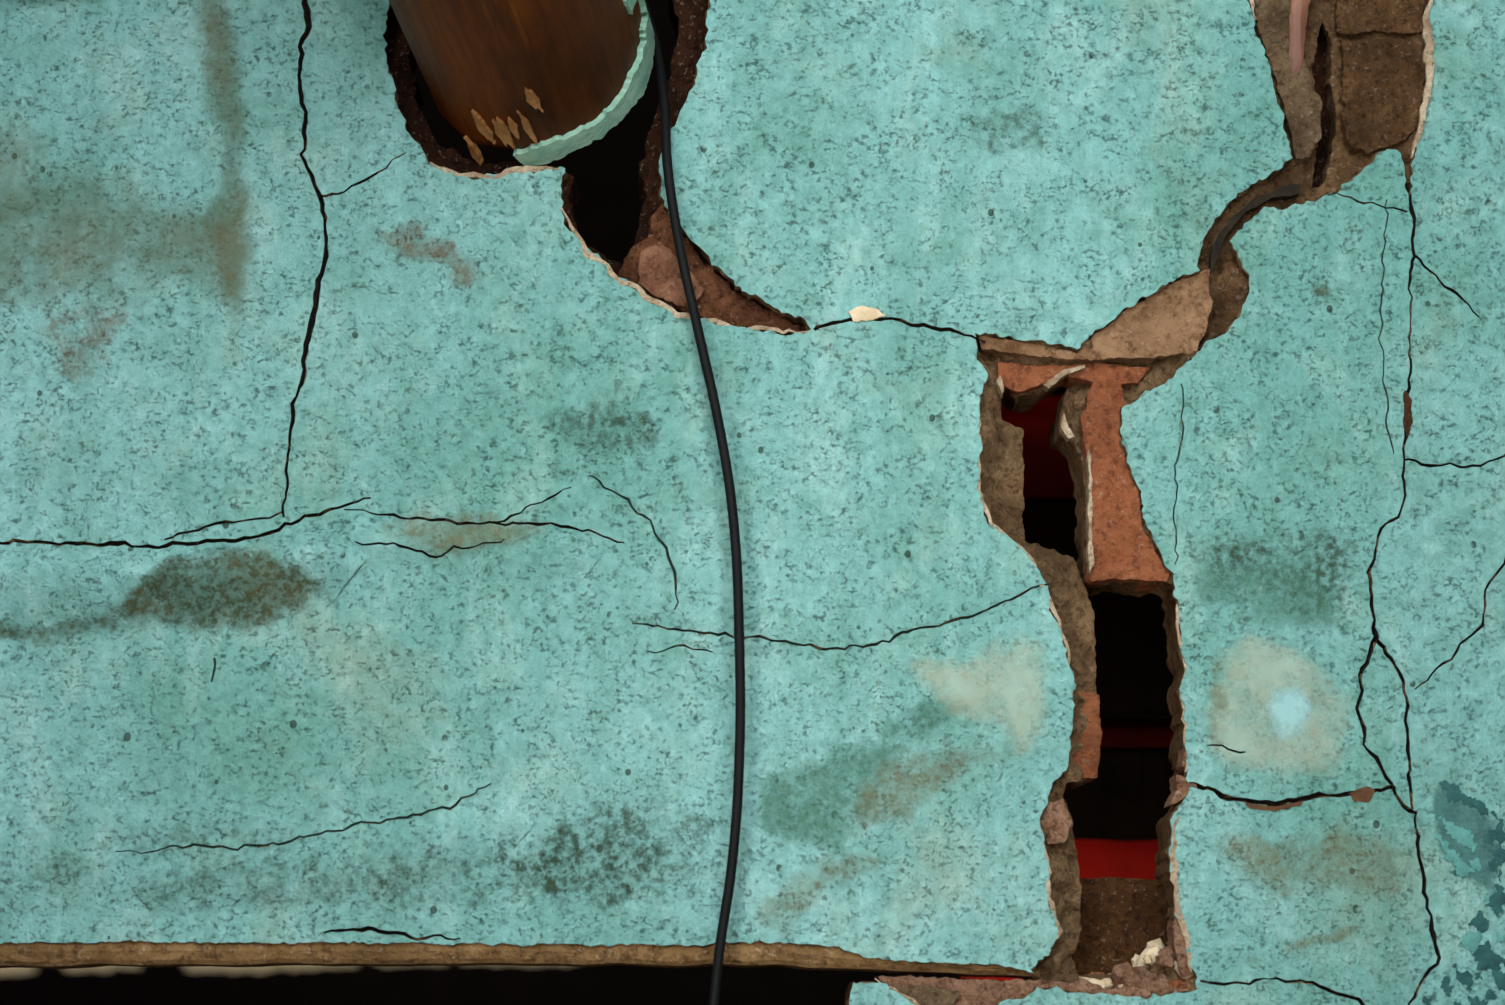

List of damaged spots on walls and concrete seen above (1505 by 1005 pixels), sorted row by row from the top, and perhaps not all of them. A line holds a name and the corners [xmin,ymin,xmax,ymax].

leakage [196,193,244,296]
crack [0,0,1050,653]
spalling [386,0,808,335]
leakage [124,568,168,610]
spalling [874,0,1435,1005]
crack [1173,383,1184,564]
crack [1189,182,1505,1005]
leakage [1272,694,1309,729]
peeling [1422,780,1505,1005]